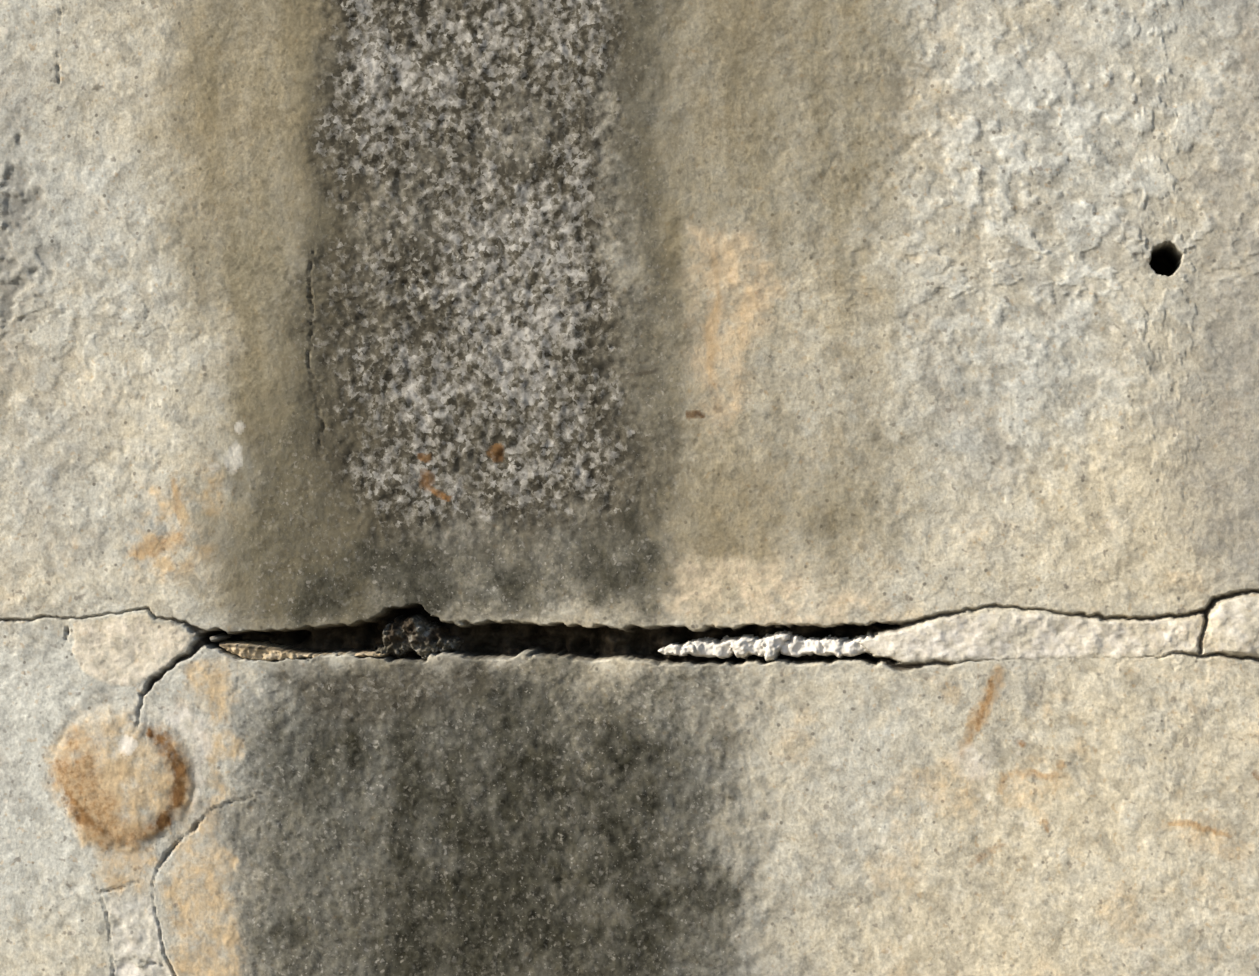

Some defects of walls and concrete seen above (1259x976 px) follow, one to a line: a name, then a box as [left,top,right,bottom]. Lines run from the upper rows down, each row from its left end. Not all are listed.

water stain [109,0,973,631]
rust [45,653,252,976]
crack [91,789,269,976]
water stain [156,656,809,976]
crack [0,586,1259,732]